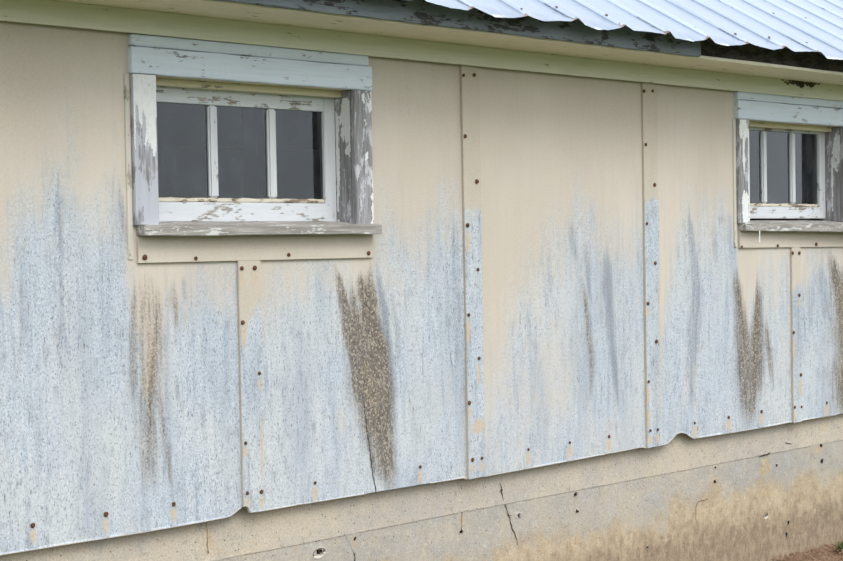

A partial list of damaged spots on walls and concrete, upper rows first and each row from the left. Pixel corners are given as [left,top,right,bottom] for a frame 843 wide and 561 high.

damp [47,164,72,367]
damp [112,168,191,510]
damp [332,251,405,493]
peeling [0,74,750,555]
damp [682,193,778,431]
peeling [735,223,842,429]
damp [802,247,843,417]
peeling [831,133,840,211]